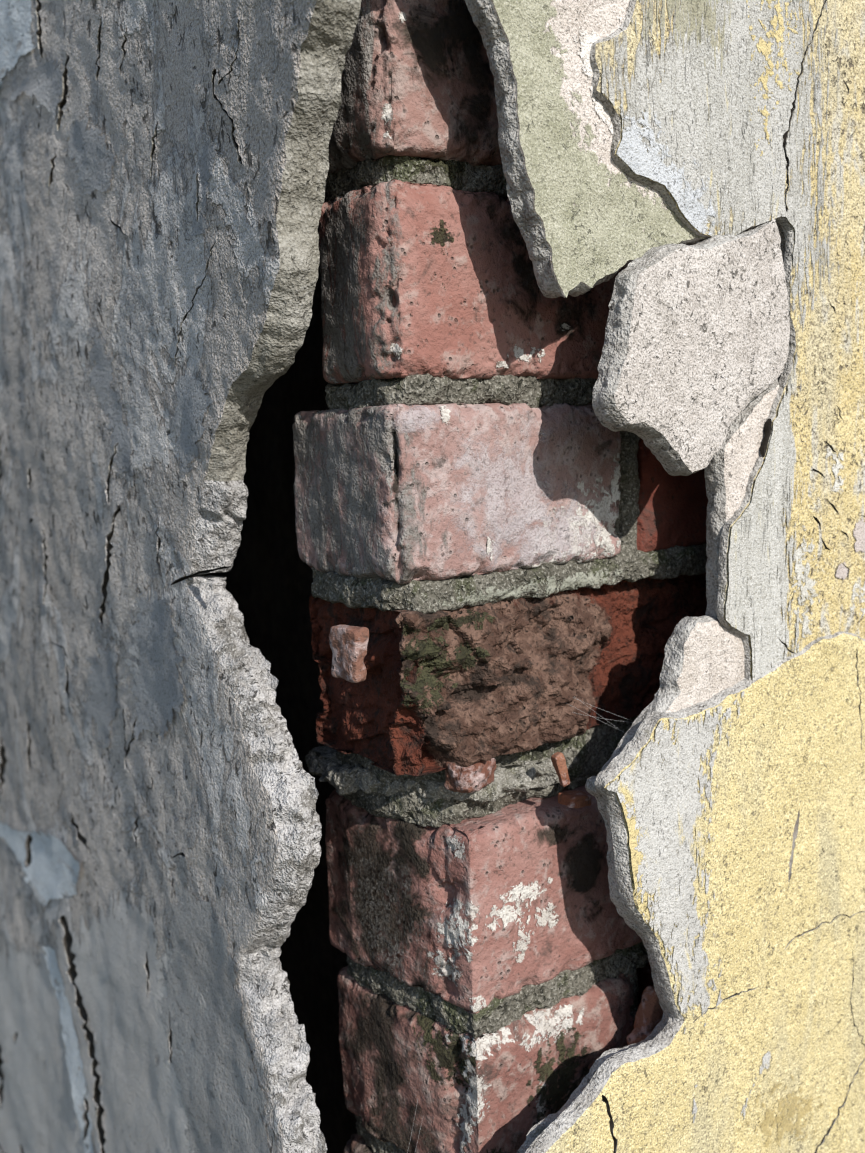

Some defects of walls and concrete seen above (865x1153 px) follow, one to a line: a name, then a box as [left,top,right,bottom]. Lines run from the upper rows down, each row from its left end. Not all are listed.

crack [36,0,127,184]
peeling [572,0,841,327]
crack [783,0,827,212]
crack [100,448,121,625]
peeling [726,351,822,680]
spalling [309,572,707,776]
crack [60,915,106,1153]
peeling [0,867,270,1153]
water stain [343,829,559,986]
water stain [469,996,487,1014]
crack [602,1095,617,1153]
peeling [607,691,745,1034]